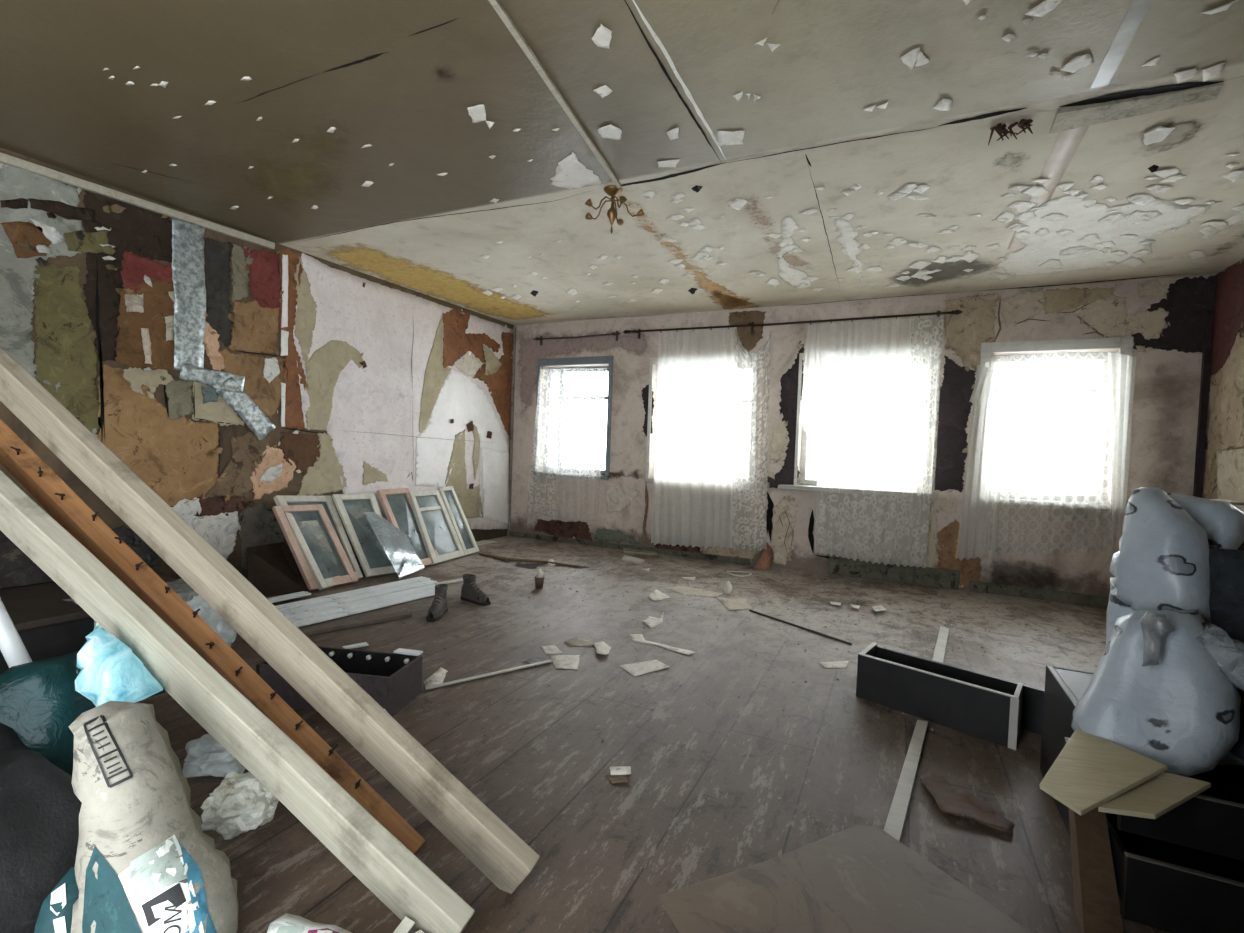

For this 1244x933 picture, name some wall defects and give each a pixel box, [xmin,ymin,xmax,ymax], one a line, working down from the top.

crack [239,18,458,103]
crack [1060,76,1243,107]
peeling [657,159,680,168]
peeling [666,128,679,141]
crack [621,0,1205,342]
peeling [1143,126,1176,145]
crack [295,191,590,243]
peeling [658,193,707,242]
water stain [645,226,749,308]
peeling [749,168,1244,589]
flaking render [96,364,301,559]
flaking render [655,341,805,565]